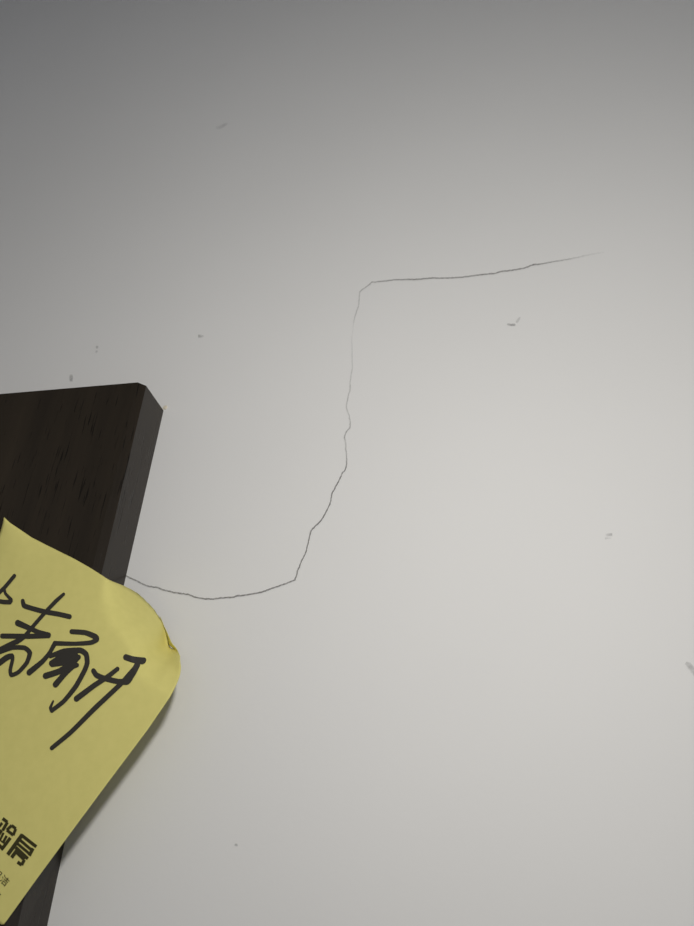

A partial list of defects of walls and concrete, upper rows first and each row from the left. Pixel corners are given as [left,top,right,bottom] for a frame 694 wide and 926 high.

crack [126,464,347,599]